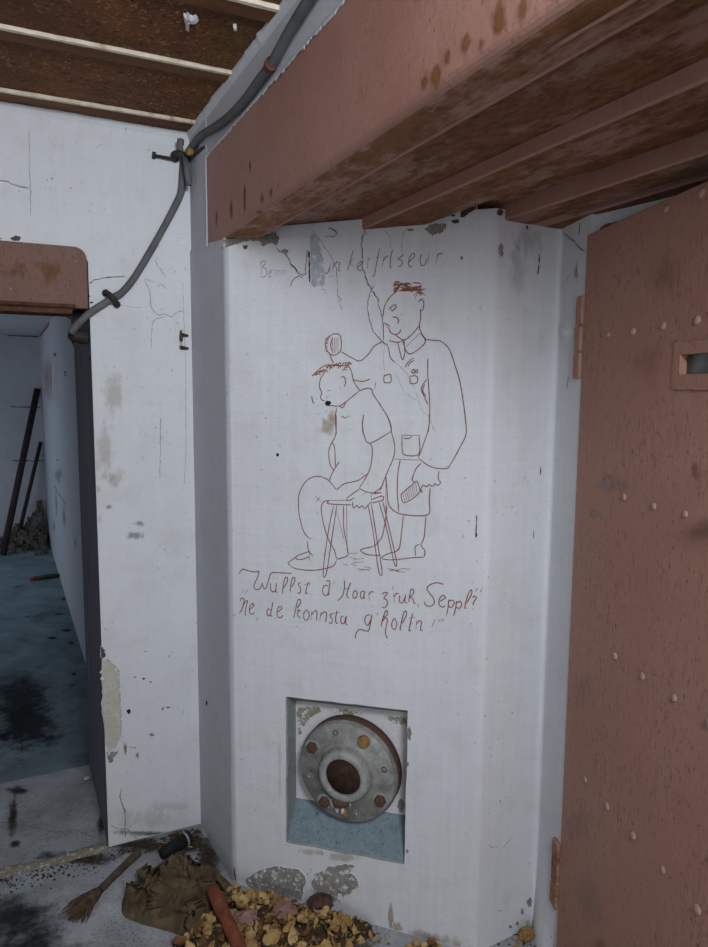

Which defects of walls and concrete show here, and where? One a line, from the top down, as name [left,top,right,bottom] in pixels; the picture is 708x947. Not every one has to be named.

rust [495,0,507,32]
rust [422,50,450,89]
crack [277,227,342,309]
crack [361,223,434,429]
leakage [0,677,57,749]
spalling [100,646,131,763]
peeling [234,863,359,903]